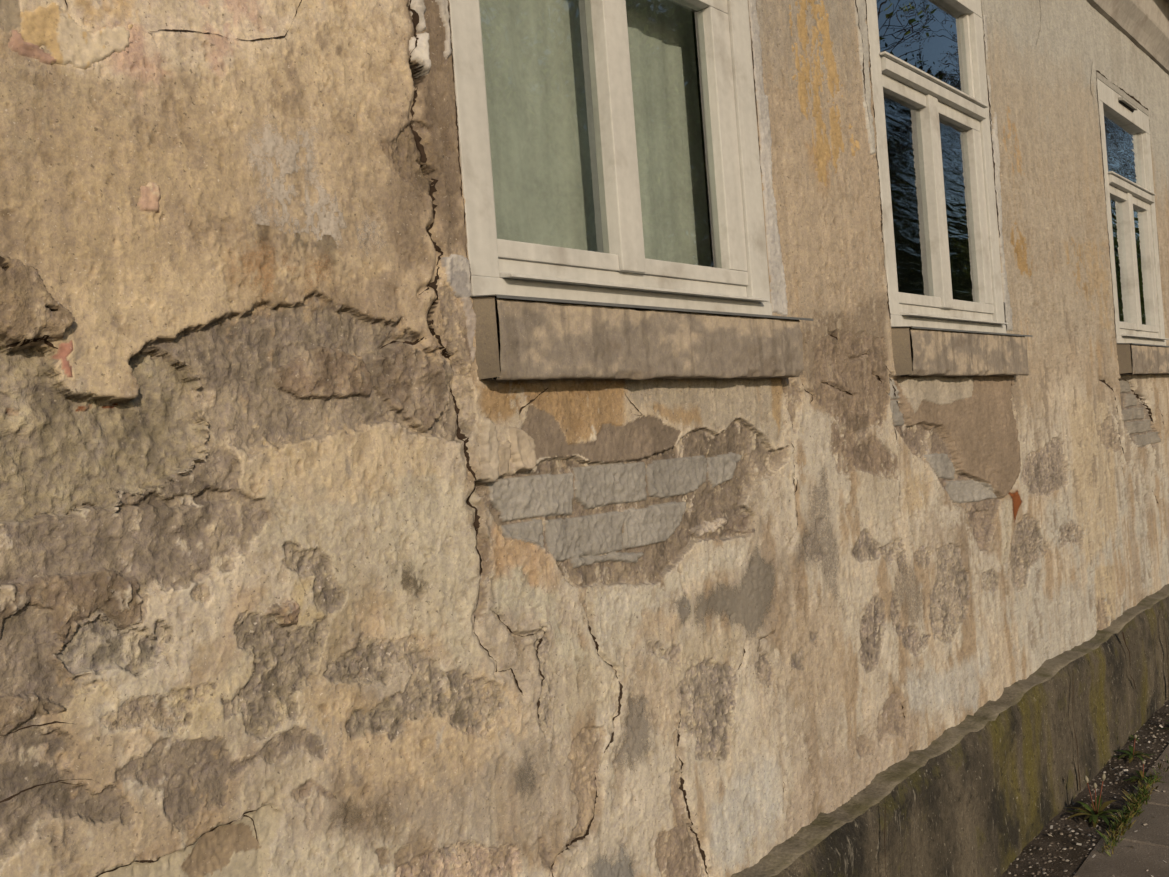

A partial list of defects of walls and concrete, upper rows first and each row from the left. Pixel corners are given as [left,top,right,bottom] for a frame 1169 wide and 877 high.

crack [152,0,302,41]
crack [380,0,545,733]
flaking render [1096,377,1161,453]
flaking render [0,277,1085,877]
crack [8,721,73,734]
crack [0,779,103,803]
crack [677,714,708,874]